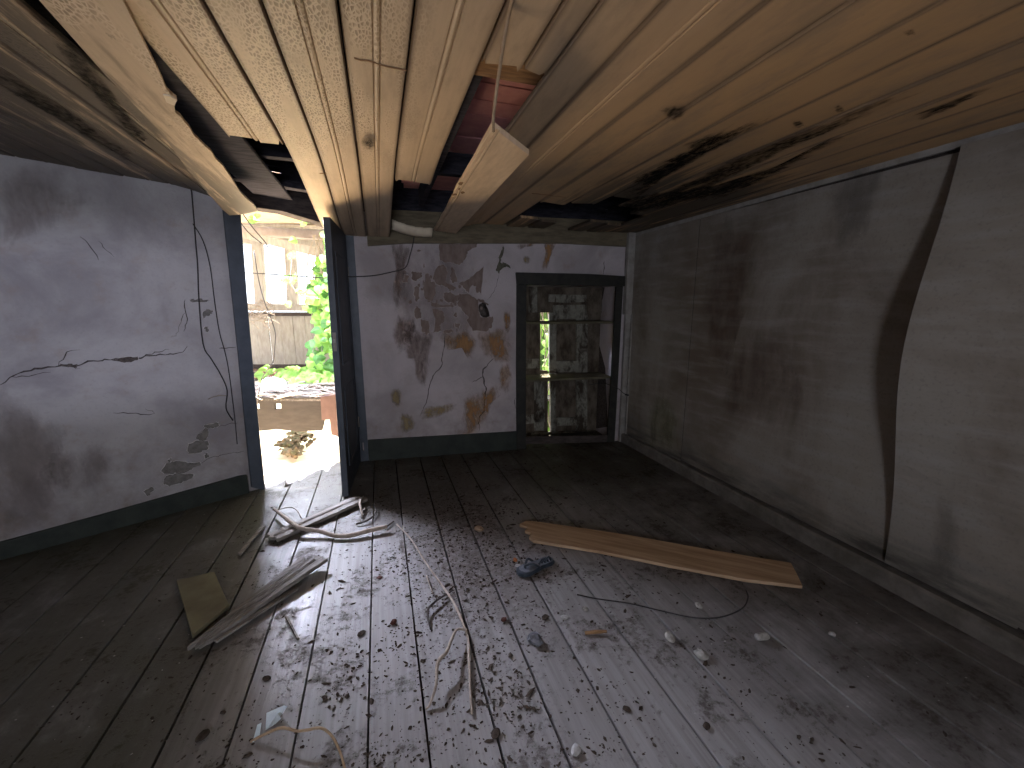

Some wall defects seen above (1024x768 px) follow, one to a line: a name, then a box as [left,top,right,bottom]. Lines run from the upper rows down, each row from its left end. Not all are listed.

damp [919,94,973,118]
damp [600,99,890,216]
flaking render [400,244,511,335]
crack [1,301,188,385]
crack [422,336,445,411]
crack [473,359,493,430]
spalling [143,422,220,496]